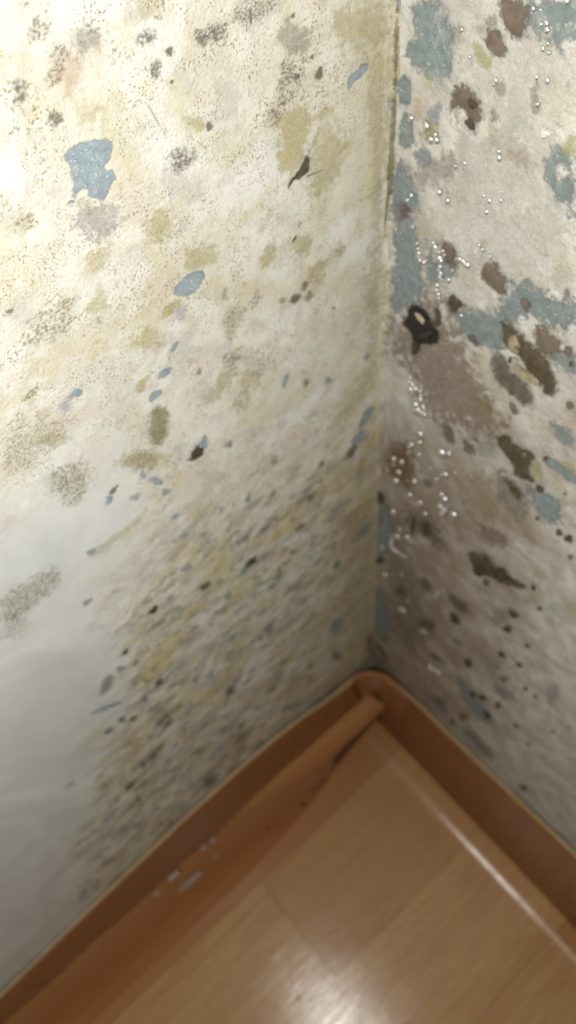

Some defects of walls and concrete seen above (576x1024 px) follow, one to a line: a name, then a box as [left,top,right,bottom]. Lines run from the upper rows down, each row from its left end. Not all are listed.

damp [195,0,275,47]
damp [46,46,68,87]
damp [151,47,172,79]
damp [267,53,322,175]
damp [171,149,191,171]
damp [279,222,325,304]
damp [23,298,76,344]
damp [125,408,170,496]
damp [188,436,206,461]
damp [460,457,547,549]
damp [556,516,574,561]
damp [446,595,466,625]